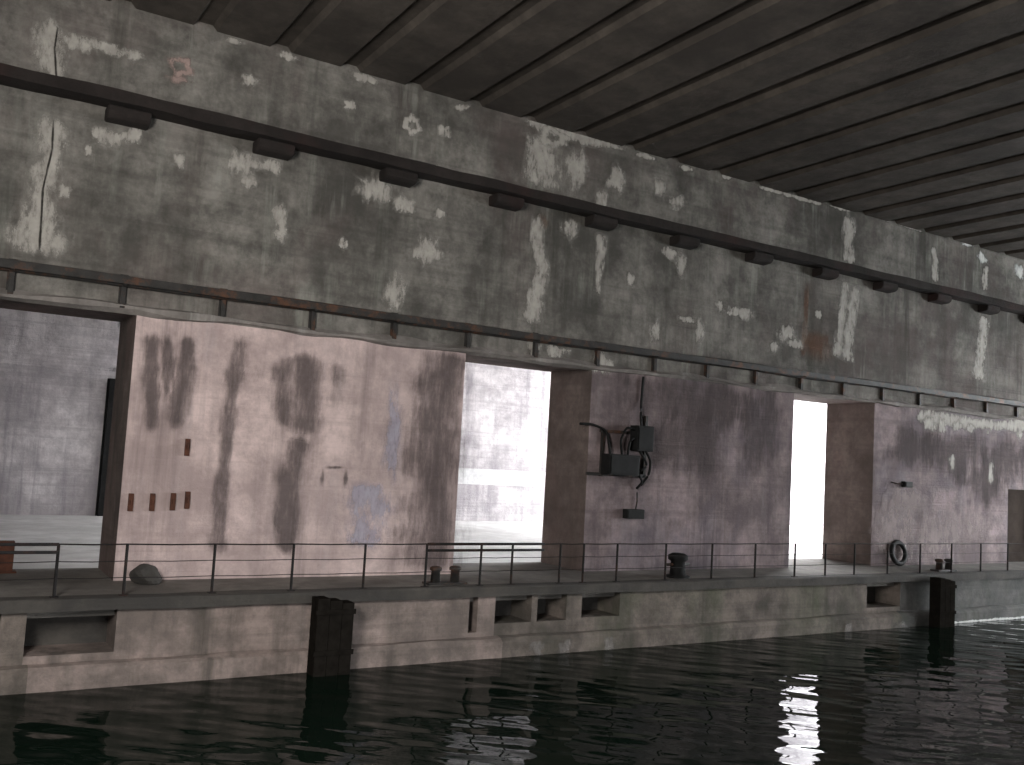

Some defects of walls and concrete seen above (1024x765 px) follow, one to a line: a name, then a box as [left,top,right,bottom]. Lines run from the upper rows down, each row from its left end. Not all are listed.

efflorescence [523,217,549,324]
efflorescence [561,219,577,240]
efflorescence [827,204,856,264]
damp [981,266,989,290]
damp [145,338,195,428]
efflorescence [833,282,859,362]
damp [972,316,987,380]
damp [213,364,241,547]
damp [274,355,317,552]
damp [896,430,1024,506]